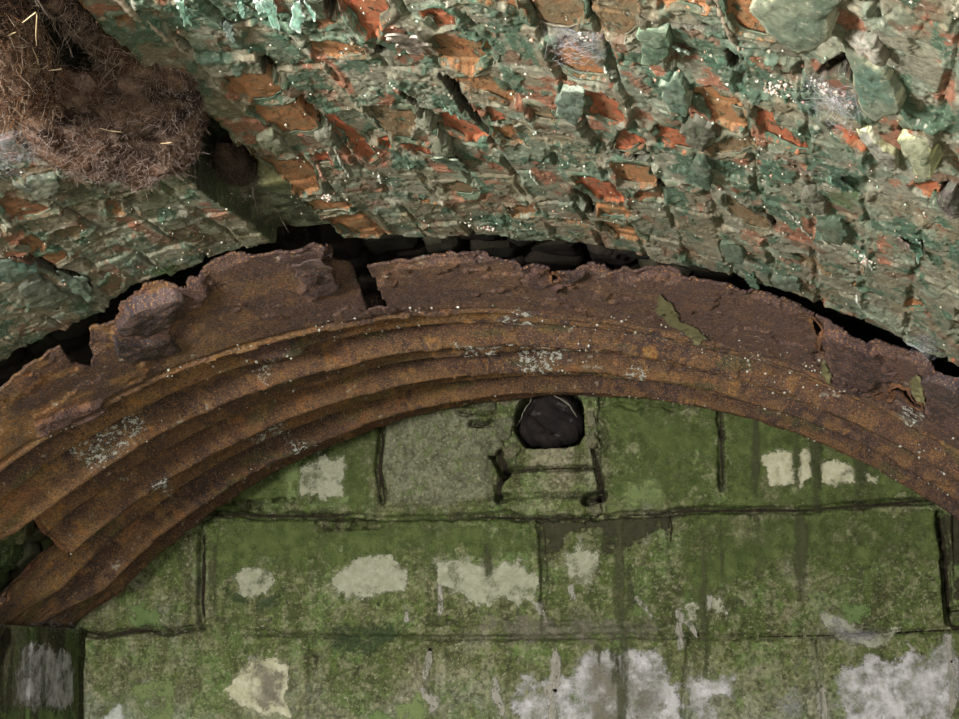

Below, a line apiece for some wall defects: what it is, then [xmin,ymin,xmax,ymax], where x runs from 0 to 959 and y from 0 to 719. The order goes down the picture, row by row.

peeling [307,0,401,61]
peeling [210,63,433,162]
peeling [419,0,818,243]
peeling [237,141,394,238]
peeling [0,197,99,268]
crack [28,253,88,282]
crack [377,427,385,502]
leakage [331,554,408,601]
leakage [433,513,736,719]
leakage [14,643,76,714]
leakage [225,655,292,718]
leakage [816,612,959,719]